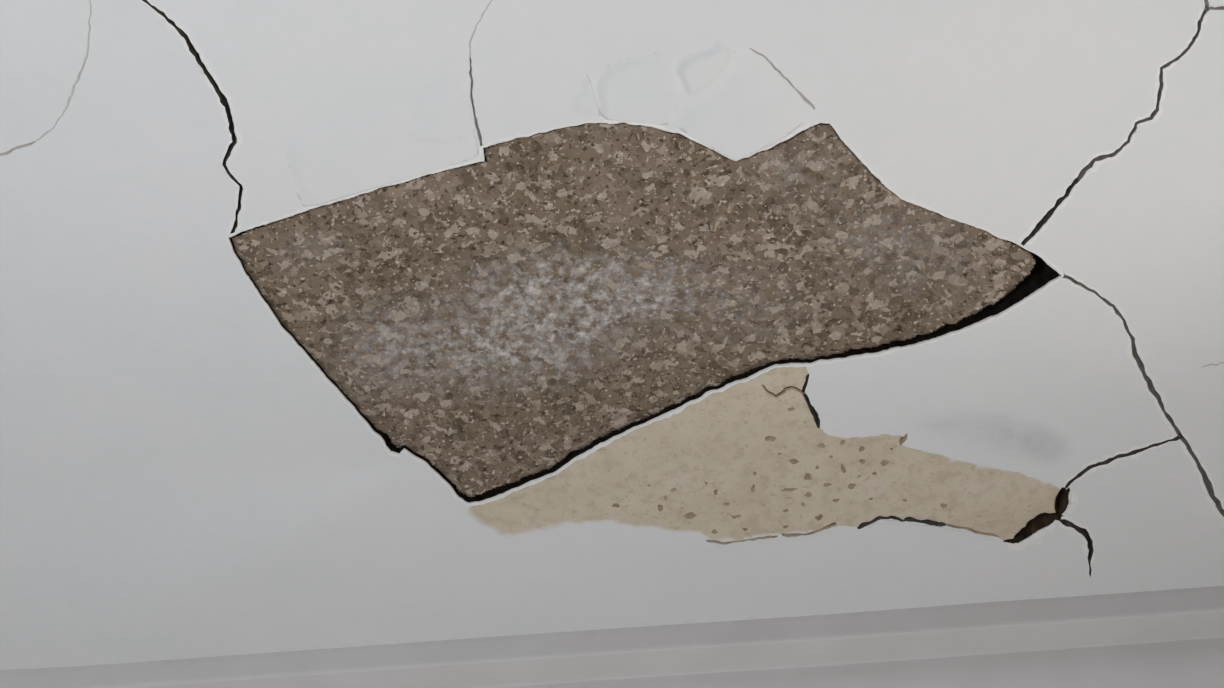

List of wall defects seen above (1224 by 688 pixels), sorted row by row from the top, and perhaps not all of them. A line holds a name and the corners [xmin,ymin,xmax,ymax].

crack [0,0,92,158]
crack [139,0,245,238]
crack [467,0,493,156]
crack [1019,0,1224,248]
spalling [225,120,1078,551]
crack [1059,272,1224,577]